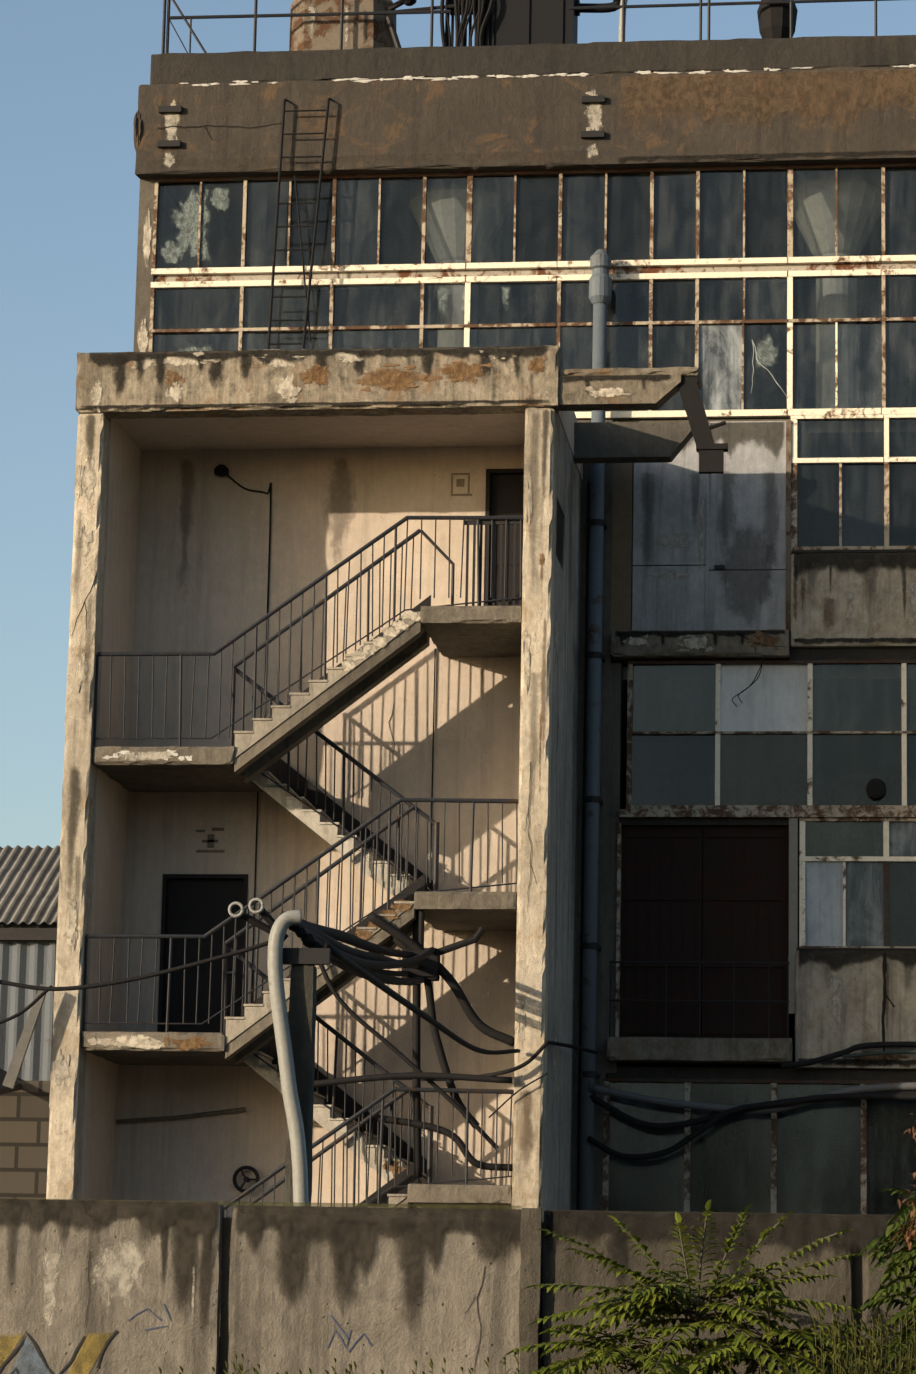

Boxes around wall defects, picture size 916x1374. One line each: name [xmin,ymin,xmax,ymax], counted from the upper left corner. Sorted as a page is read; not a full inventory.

spalling [157,100,182,167]
spalling [91,380,102,413]
spalling [132,319,222,403]
spalling [254,349,308,403]
spalling [335,352,364,363]
damp [709,422,783,455]
damp [616,552,916,645]
damp [799,950,916,1023]
damp [0,1199,216,1328]
damp [236,1205,522,1316]